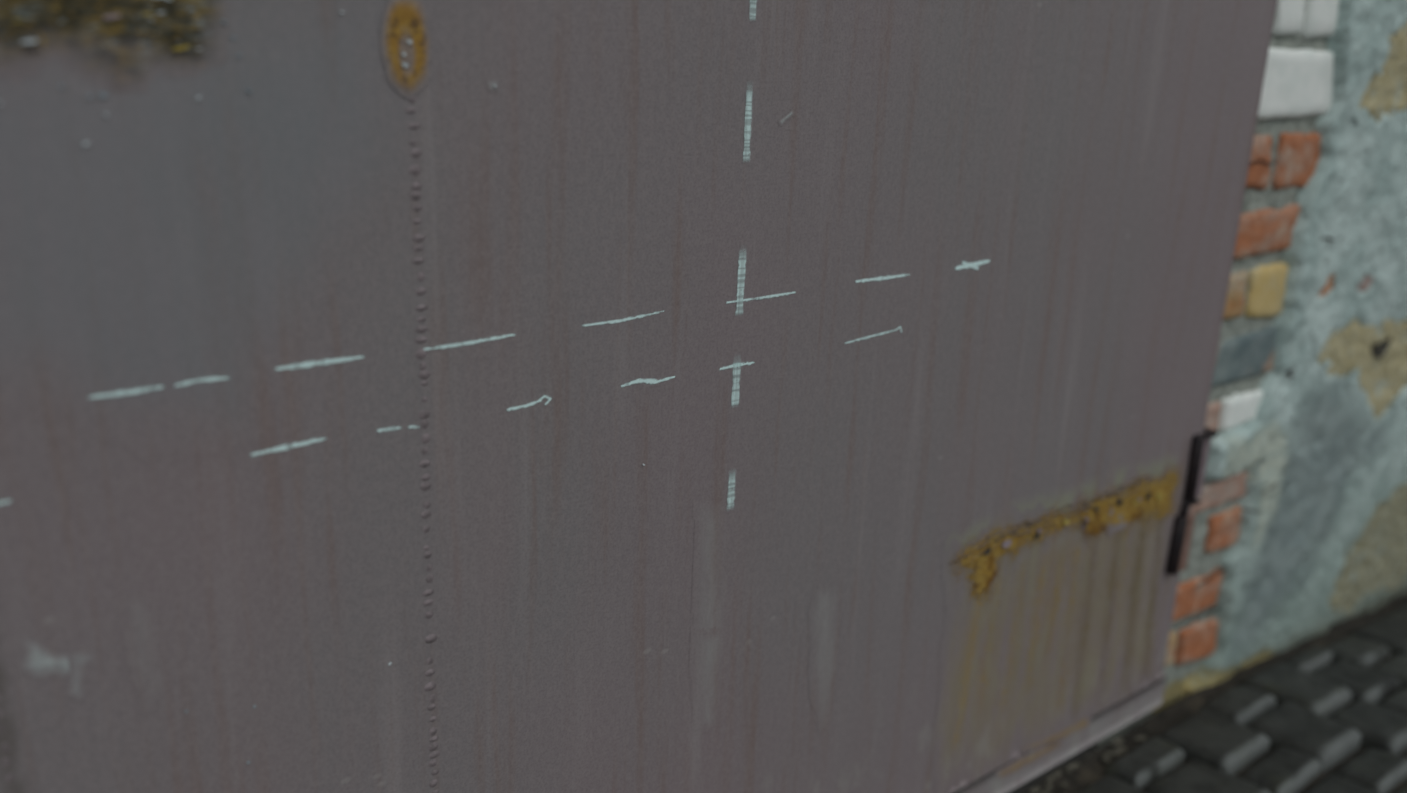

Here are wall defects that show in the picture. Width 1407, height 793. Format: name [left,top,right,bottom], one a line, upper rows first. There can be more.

corrosion [0,0,234,93]
corrosion [380,0,432,99]
spalling [1355,23,1407,125]
spalling [1315,318,1407,420]
corrosion [930,446,1189,793]